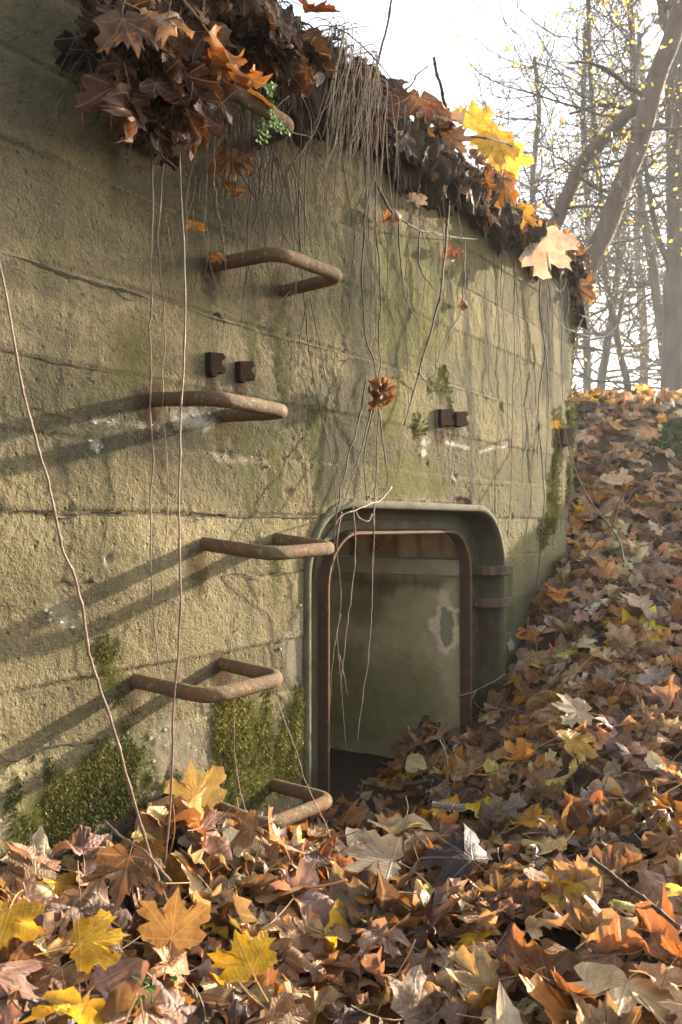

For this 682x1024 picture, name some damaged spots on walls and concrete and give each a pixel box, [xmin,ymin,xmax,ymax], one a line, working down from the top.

crack [1,253,540,412]
peeling [426,588,459,658]